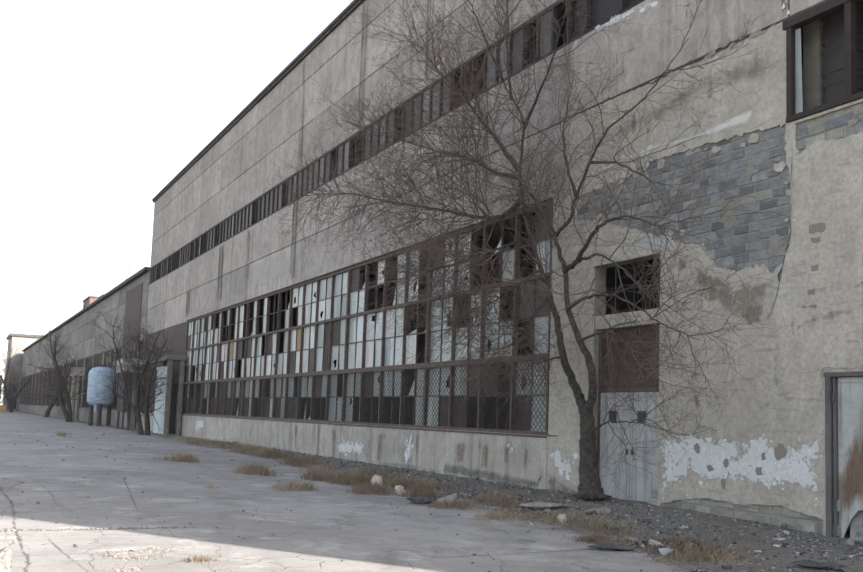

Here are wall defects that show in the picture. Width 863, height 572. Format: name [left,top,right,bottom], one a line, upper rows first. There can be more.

spalling [595,1,658,32]
spalling [573,104,863,273]
crack [768,206,792,318]
spalling [698,273,766,322]
peeling [550,448,579,480]
peeling [648,429,841,537]
corrosion [838,441,863,506]